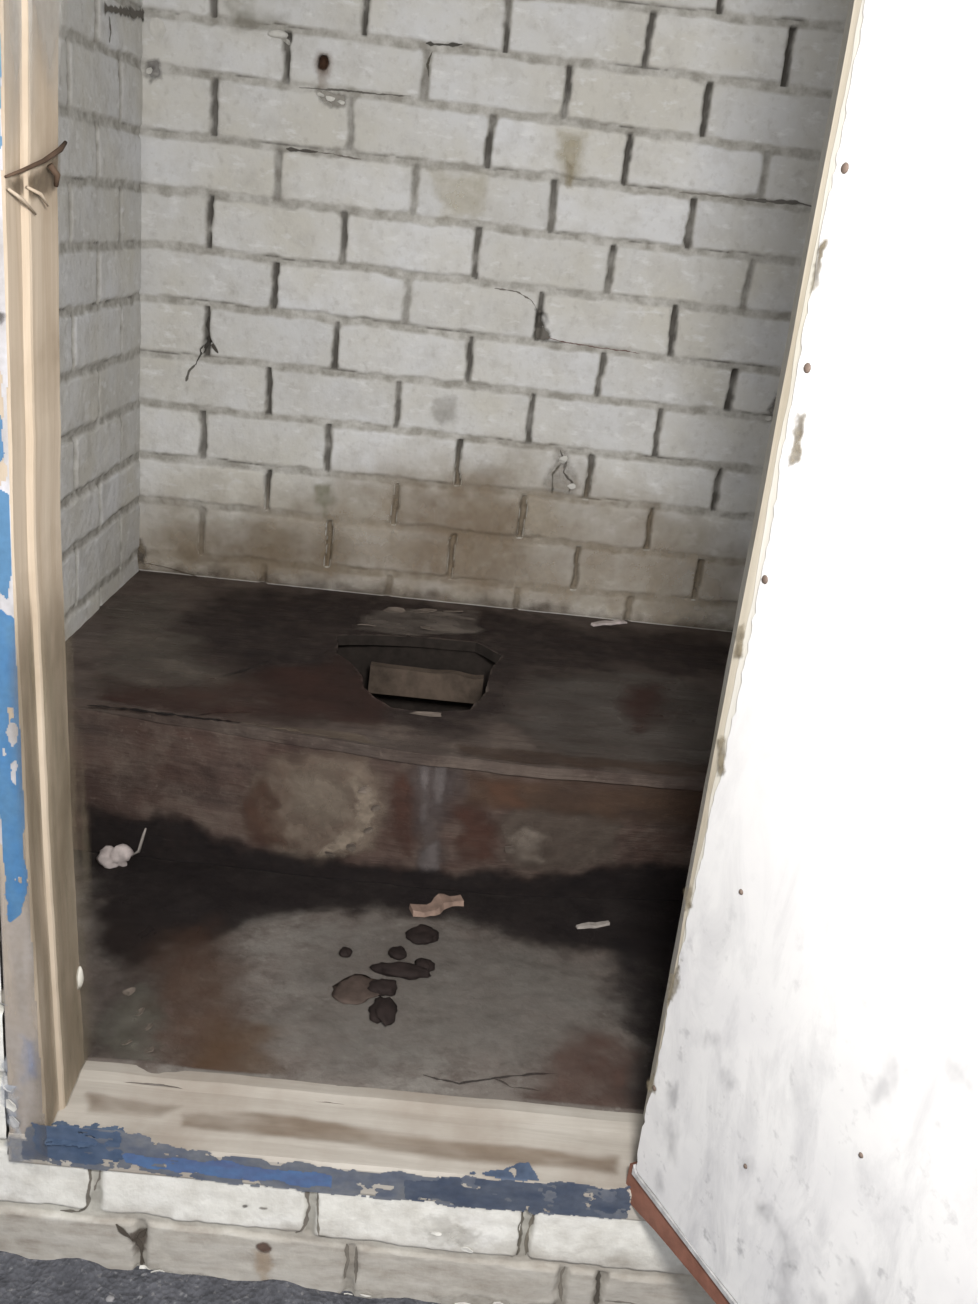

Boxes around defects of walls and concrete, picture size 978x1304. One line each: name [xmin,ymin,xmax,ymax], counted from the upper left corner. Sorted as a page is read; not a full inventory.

corrosion [318,55,329,70]
damp [235,480,724,629]
corrosion [468,782,703,816]
damp [84,765,689,1108]
peeling [2,1061,19,1130]